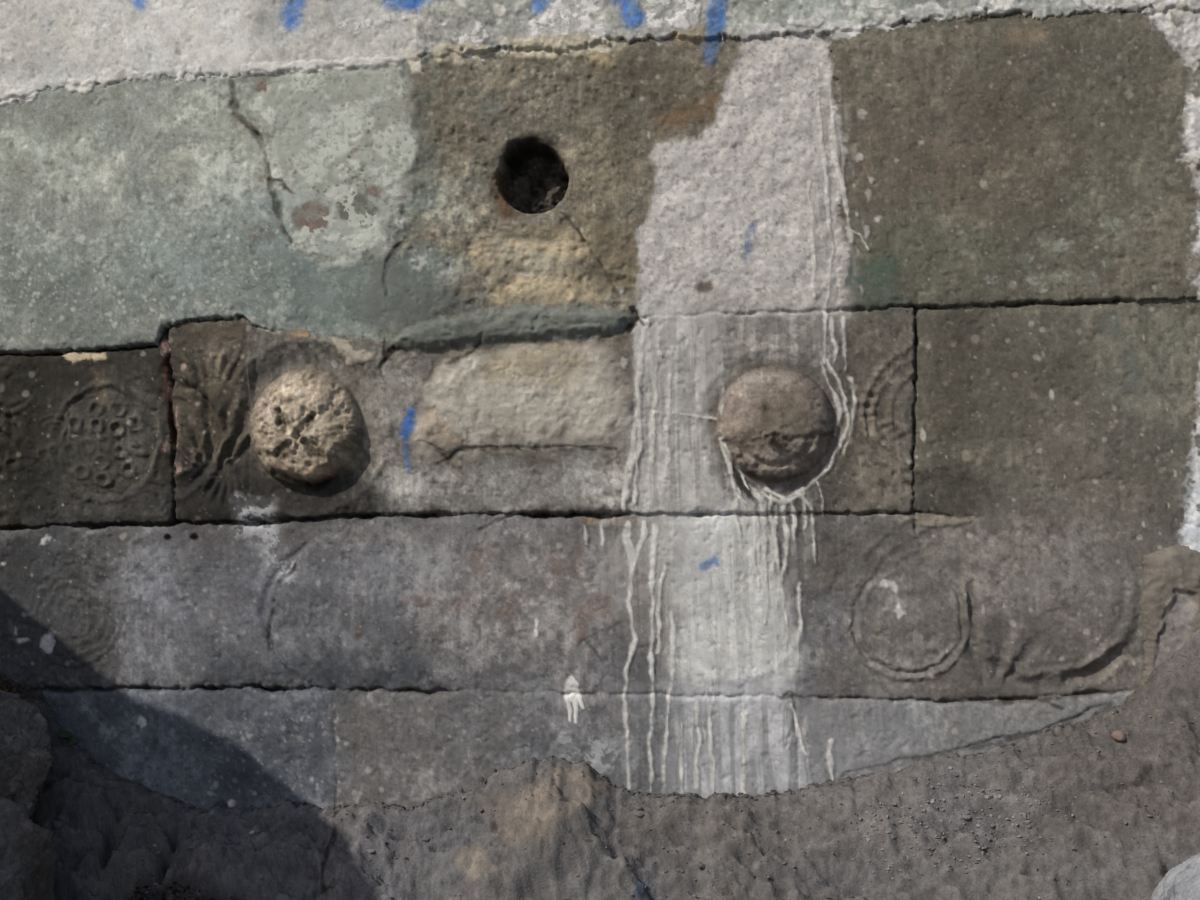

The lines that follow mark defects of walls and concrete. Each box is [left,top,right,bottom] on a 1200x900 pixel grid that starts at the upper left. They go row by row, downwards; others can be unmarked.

crack [229,78,292,240]
leakage [559,319,719,793]
leakage [740,710,760,794]
leakage [790,704,808,763]